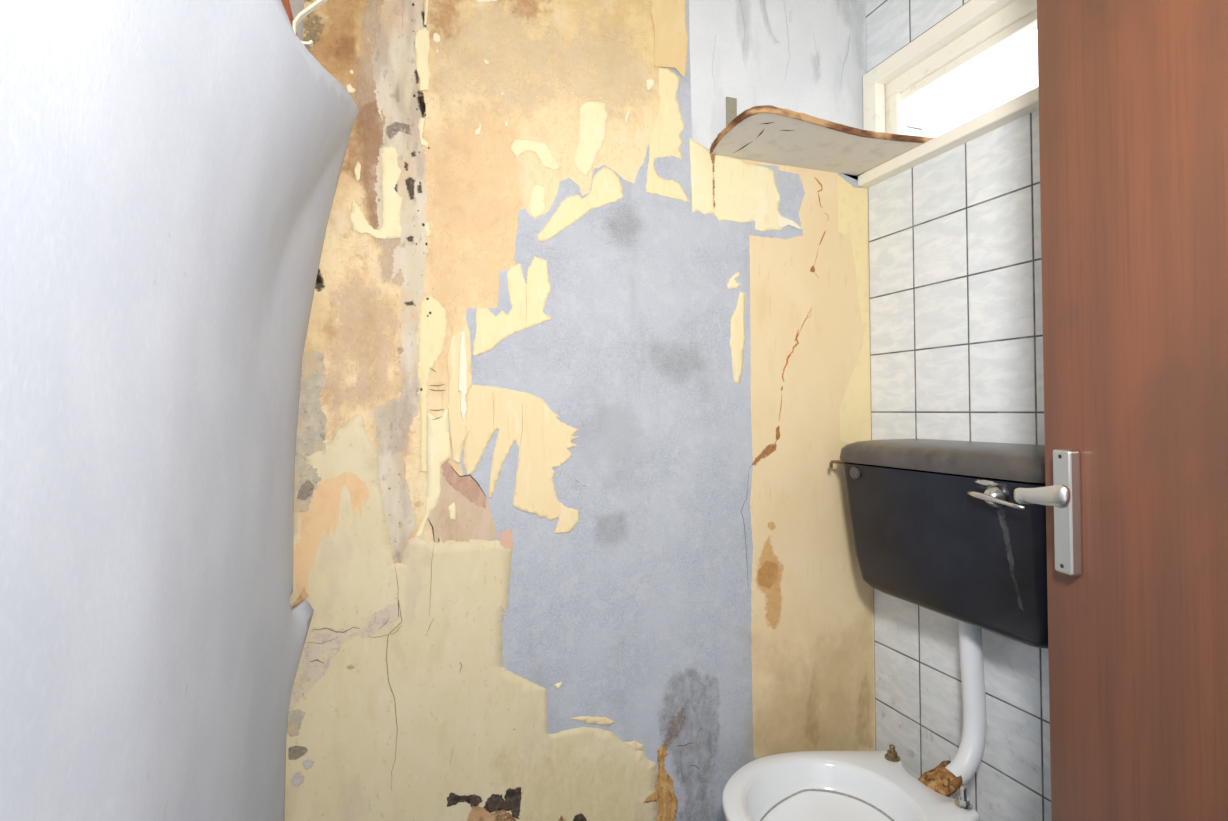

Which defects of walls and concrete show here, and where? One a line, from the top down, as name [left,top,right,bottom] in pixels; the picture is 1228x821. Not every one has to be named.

peeling [646,0,690,202]
peeling [284,0,657,821]
water stain [757,544,782,626]
rust [643,744,678,821]